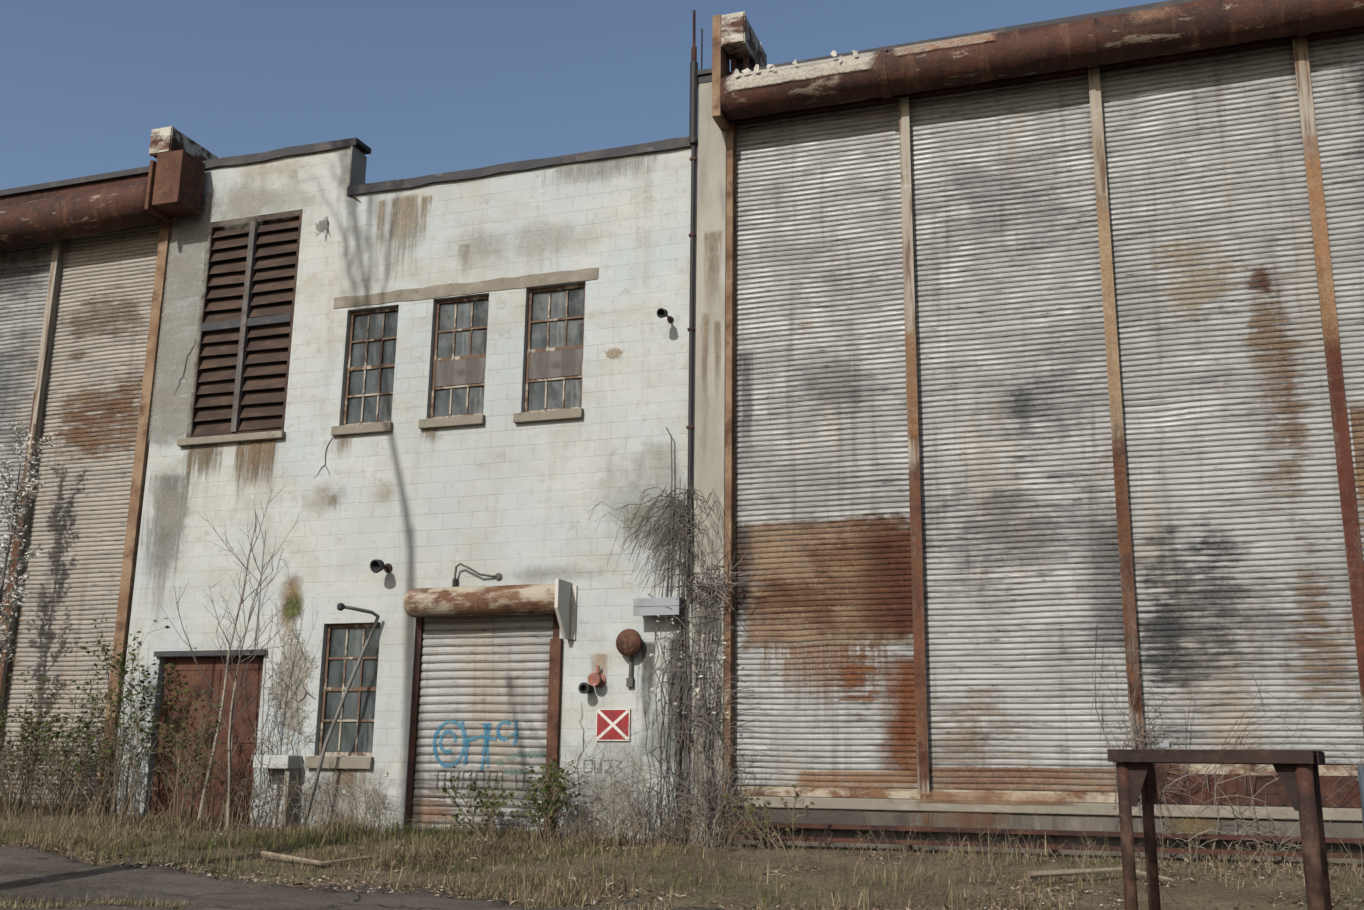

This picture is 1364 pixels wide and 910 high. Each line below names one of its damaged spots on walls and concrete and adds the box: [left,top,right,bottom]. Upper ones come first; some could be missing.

leakage [377,196,432,248]
corrosion [1151,242,1232,307]
corrosion [27,368,144,461]
corrosion [1246,267,1310,495]
corrosion [1288,139,1364,702]
corrosion [0,483,25,691]
leakage [142,444,222,574]
corrosion [736,331,1118,826]
leakage [1145,600,1184,682]
leakage [1206,532,1246,561]